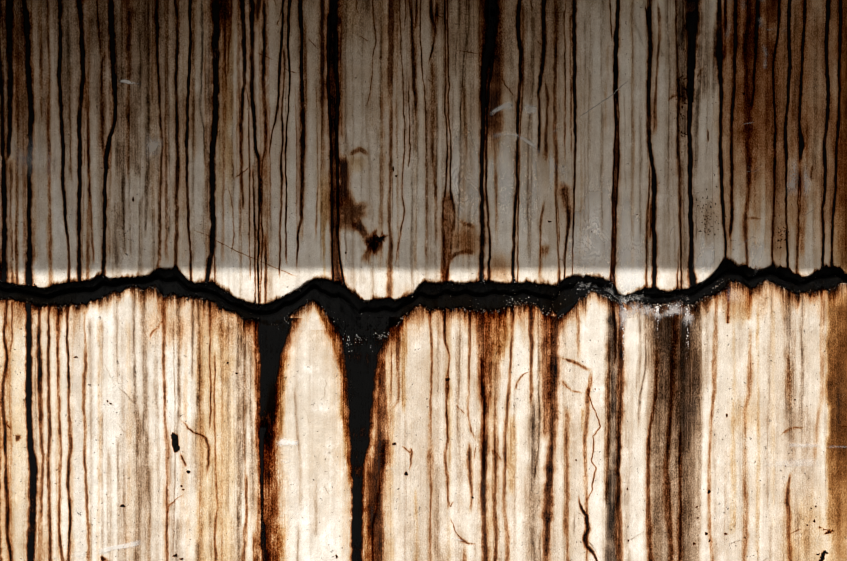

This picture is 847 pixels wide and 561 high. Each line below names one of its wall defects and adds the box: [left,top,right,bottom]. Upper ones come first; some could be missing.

damp [0,0,317,307]
damp [326,0,345,286]
rust [321,107,393,299]
crack [0,164,847,360]
rust [452,0,505,282]
rust [725,0,847,230]
damp [0,299,13,561]
damp [25,303,73,561]
damp [161,294,186,561]
damp [237,318,299,561]
damp [315,301,405,561]
crack [563,359,601,561]